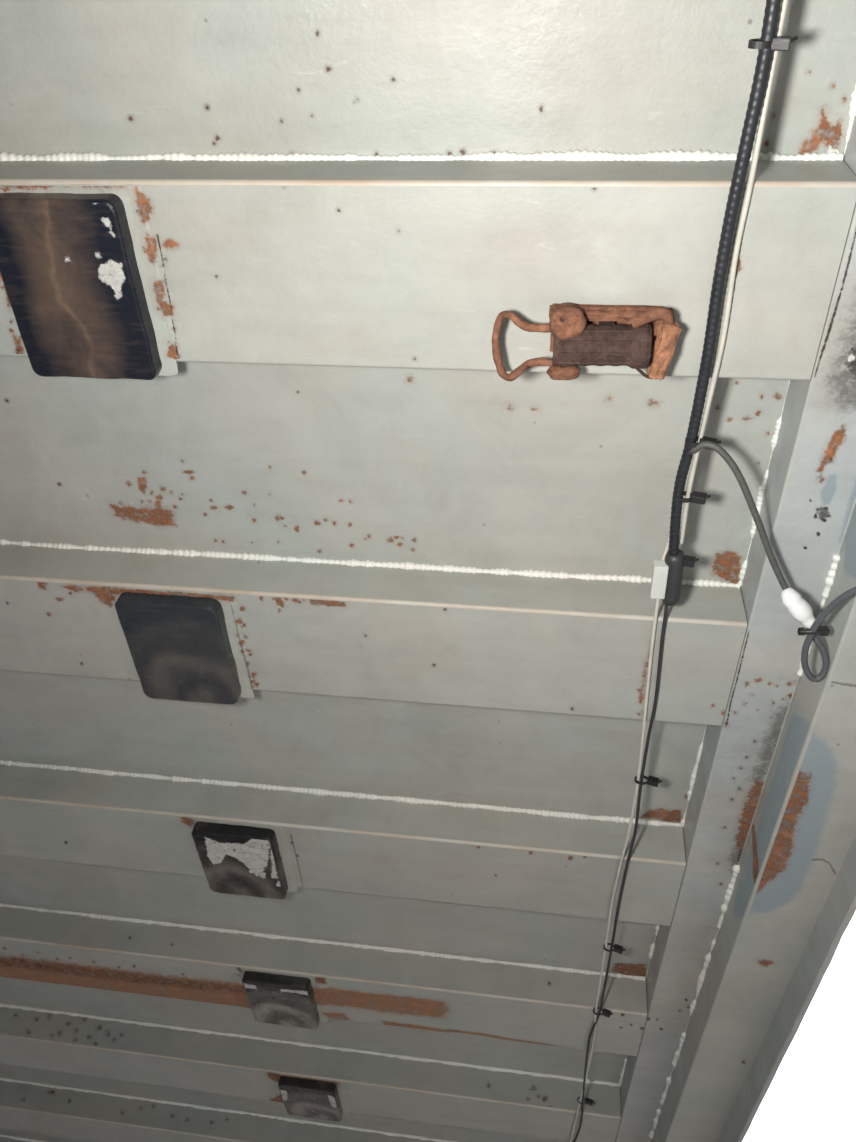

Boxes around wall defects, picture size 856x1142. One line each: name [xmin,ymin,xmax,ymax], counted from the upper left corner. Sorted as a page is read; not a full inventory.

corrosion [760,107,782,151]
corrosion [788,64,852,155]
corrosion [0,186,185,359]
corrosion [810,420,855,486]
corrosion [82,457,198,533]
corrosion [199,488,420,554]
corrosion [704,543,746,584]
corrosion [32,581,350,689]
corrosion [633,793,688,824]
corrosion [724,757,824,898]
corrosion [0,945,251,1008]
corrosion [606,959,649,977]